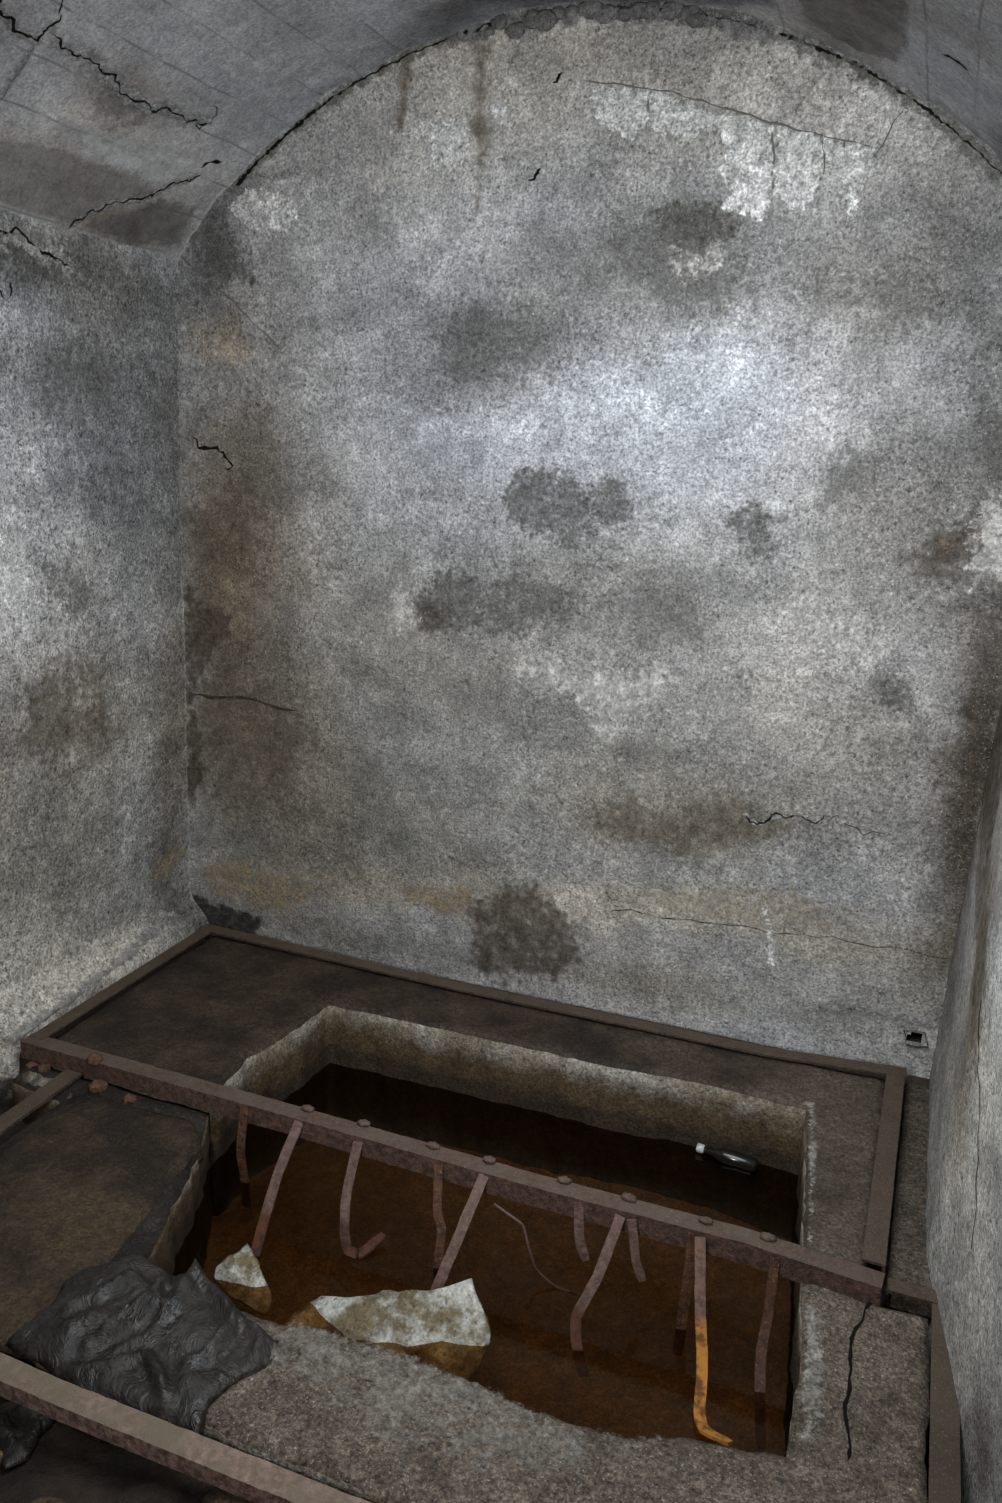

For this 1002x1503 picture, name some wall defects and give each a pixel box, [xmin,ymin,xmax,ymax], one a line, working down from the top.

crack [0,0,1002,280]
water stain [502,467,633,548]
water stain [909,490,1002,593]
crack [191,694,296,711]
water stain [383,571,709,745]
crack [743,812,885,836]
water stain [472,886,581,986]
crack [843,1302,872,1460]